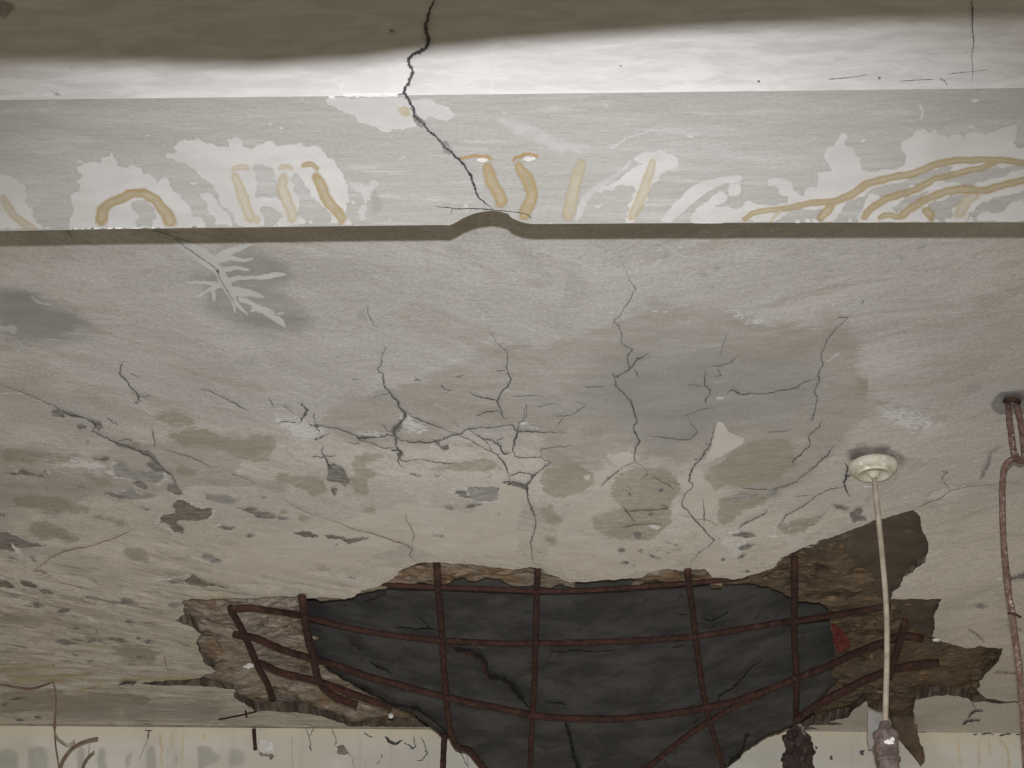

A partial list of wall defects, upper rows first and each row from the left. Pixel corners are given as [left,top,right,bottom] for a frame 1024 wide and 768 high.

water stain [0,173,50,230]
water stain [69,137,382,340]
water stain [326,63,455,132]
crack [398,0,530,217]
water stain [574,150,679,223]
water stain [661,104,1024,224]
crack [1,361,255,495]
peeling [0,449,369,564]
peeling [152,411,327,497]
water stain [397,412,429,435]
crack [202,255,869,567]
spalling [166,438,1002,768]